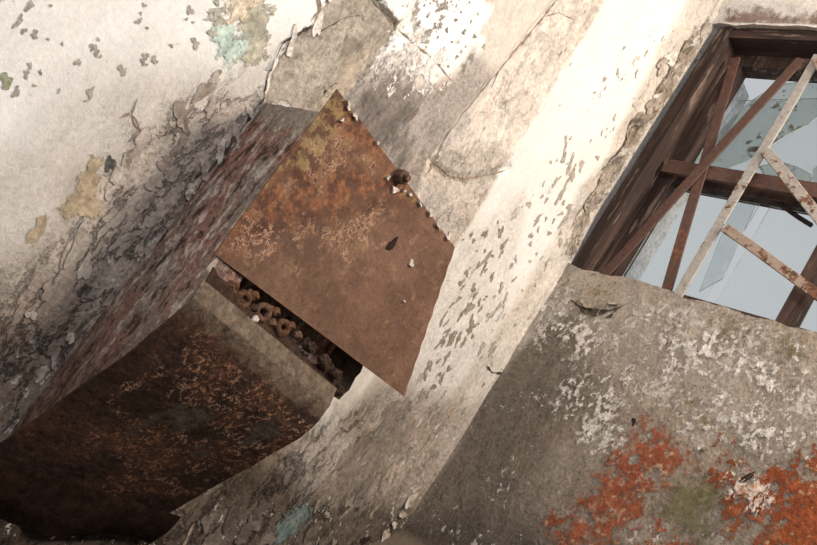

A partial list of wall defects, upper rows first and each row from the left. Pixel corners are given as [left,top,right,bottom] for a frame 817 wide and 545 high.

spalling [13,0,50,41]
peeling [0,62,42,98]
spalling [57,0,452,280]
damp [356,70,422,169]
peeling [26,214,52,247]
peeling [35,333,75,383]